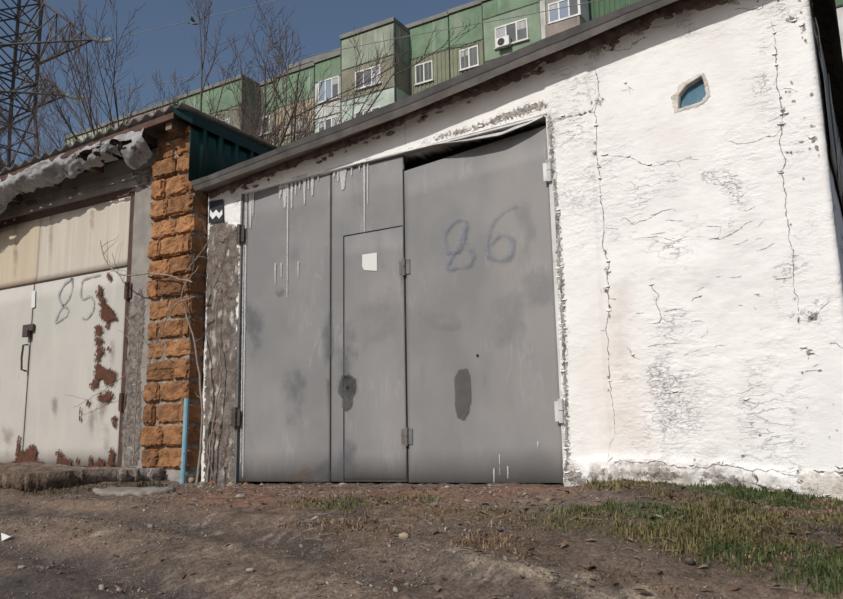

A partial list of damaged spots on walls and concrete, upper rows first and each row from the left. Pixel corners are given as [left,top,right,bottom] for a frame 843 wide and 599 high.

damp [274,176,314,280]
crack [557,25,843,492]
rust [79,273,117,421]
rust [6,435,46,464]
rust [55,449,78,466]
rust [88,446,115,467]
spalling [637,468,683,481]
spalling [701,472,745,484]
spalling [794,469,843,500]